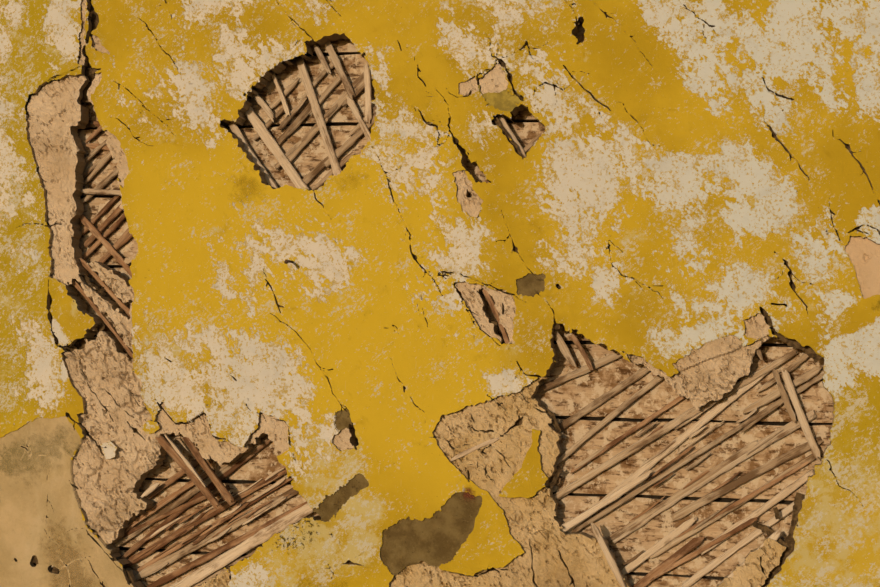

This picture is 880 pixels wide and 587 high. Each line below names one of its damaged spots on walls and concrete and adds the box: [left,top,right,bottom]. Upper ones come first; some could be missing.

crack [37,0,101,105]
crack [111,83,176,145]
peeling [142,0,546,344]
crack [762,77,809,192]
crack [826,198,880,241]
crack [832,130,880,205]
spalling [0,0,369,587]
crack [263,270,349,419]
crack [372,147,561,482]
spalling [380,0,880,587]
crack [759,250,825,363]
crack [526,467,562,499]